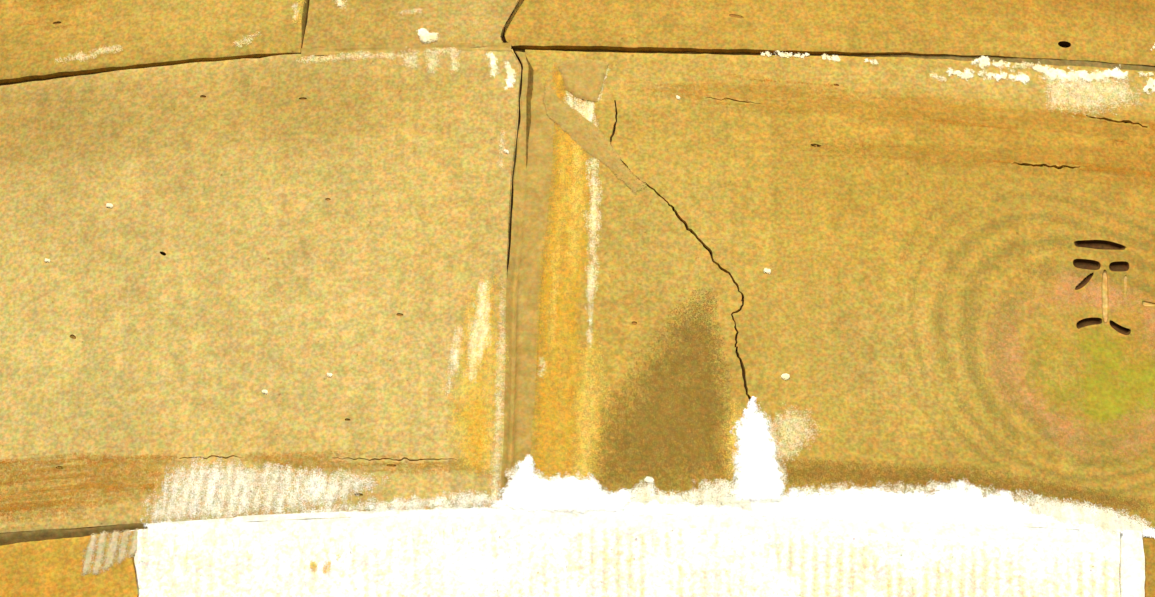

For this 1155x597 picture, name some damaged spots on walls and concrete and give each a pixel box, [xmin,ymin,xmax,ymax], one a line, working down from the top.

crack [609,103,617,145]
water stain [532,63,737,501]
crack [655,192,751,401]
water stain [778,178,1155,521]